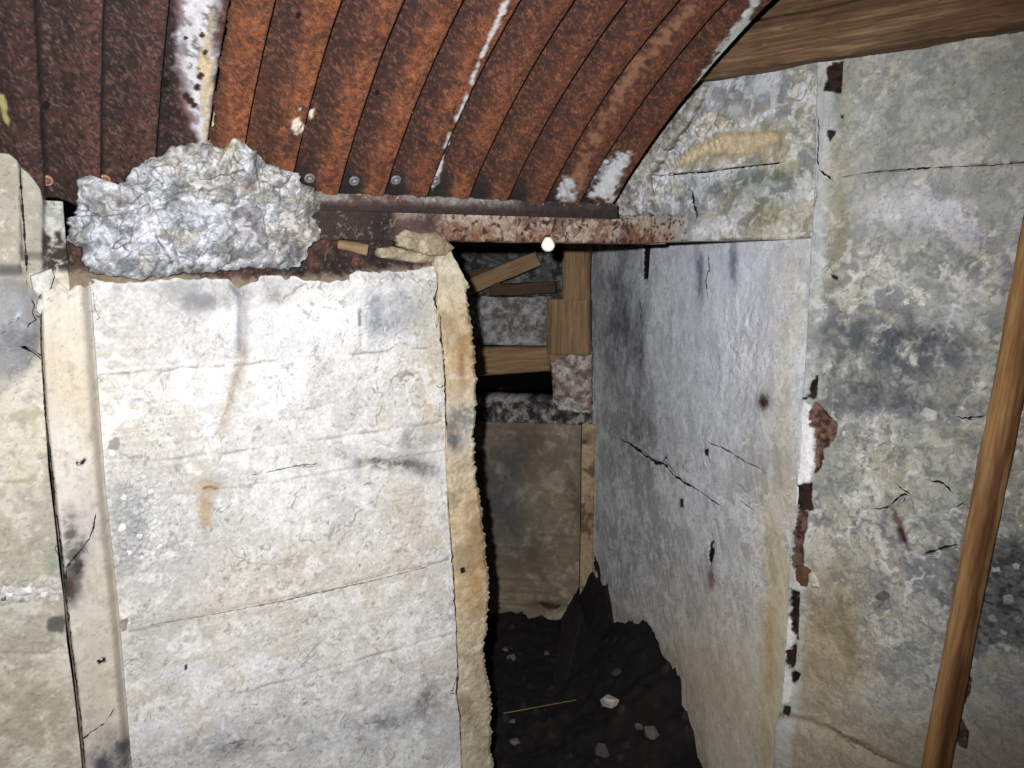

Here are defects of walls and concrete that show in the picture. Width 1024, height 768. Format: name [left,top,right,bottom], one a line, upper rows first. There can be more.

efflorescence [177,0,219,144]
efflorescence [557,151,630,203]
crack [810,119,1024,208]
corrosion [618,214,683,242]
leakage [874,345,905,367]
hole [803,373,818,400]
corrosion [202,482,219,527]
crack [622,439,766,510]
spalling [786,483,817,511]
crack [872,484,910,510]
crack [924,544,957,558]
spalling [786,570,823,682]